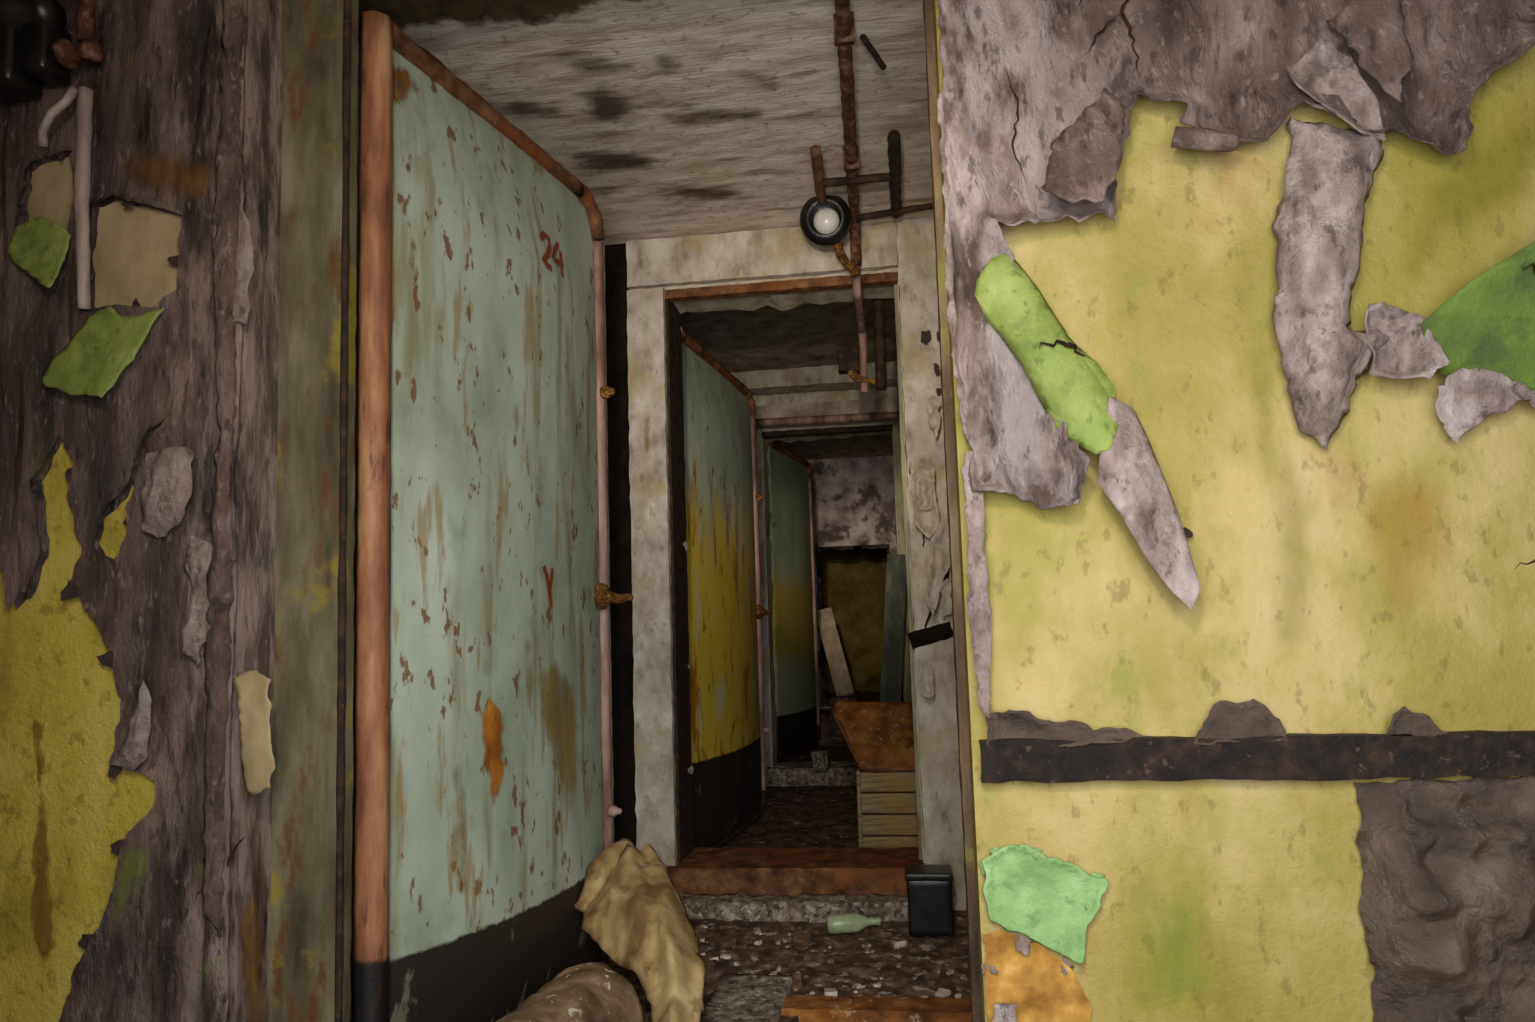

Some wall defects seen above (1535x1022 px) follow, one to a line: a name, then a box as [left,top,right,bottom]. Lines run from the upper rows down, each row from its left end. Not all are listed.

rust [393,67,417,100]
damp [585,91,627,119]
damp [575,152,650,170]
damp [666,189,736,199]
damp [681,110,755,123]
crack [1004,67,1026,181]
crack [1077,0,1140,79]
peeling [90,200,182,308]
peeling [907,0,1535,748]
peeling [0,442,213,1022]
peeling [233,670,276,796]
rust [483,698,504,797]